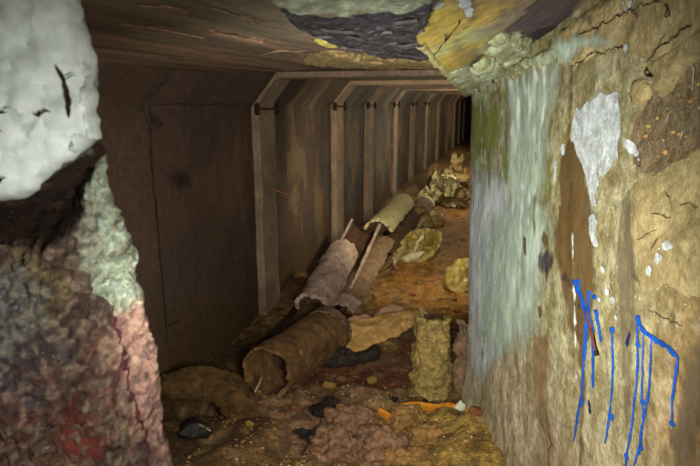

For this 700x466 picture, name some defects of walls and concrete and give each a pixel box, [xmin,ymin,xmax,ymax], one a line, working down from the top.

spalling [270,0,469,97]
crack [570,0,689,75]
crack [141,76,239,329]
damp [469,37,600,376]
crack [111,302,151,466]